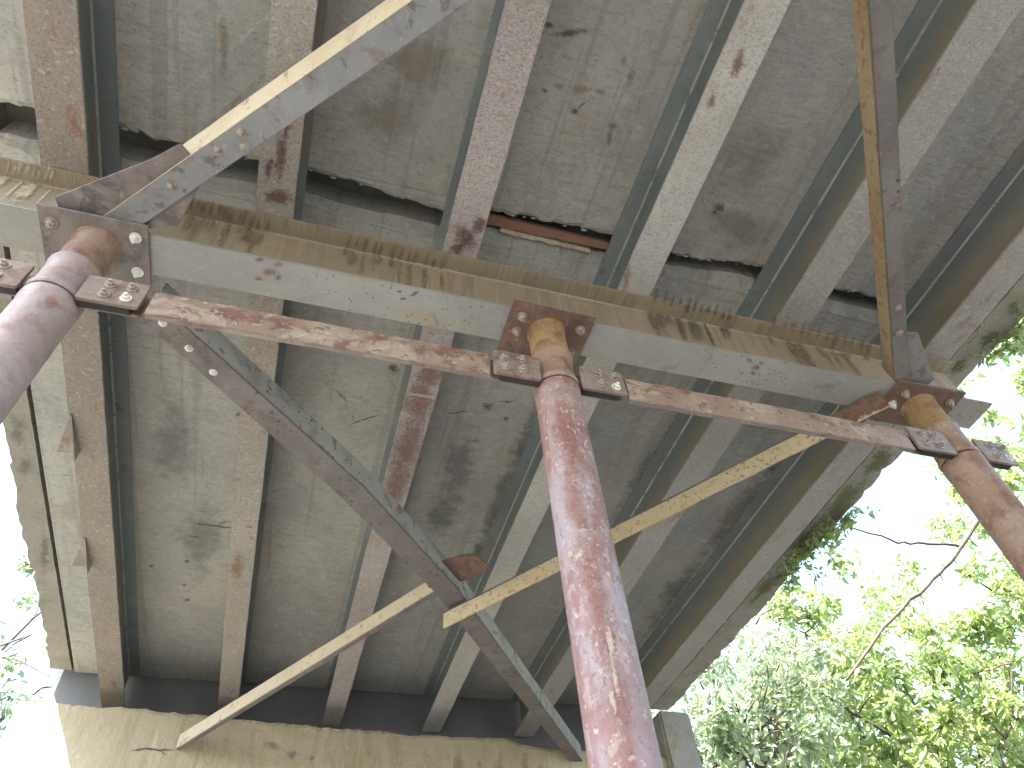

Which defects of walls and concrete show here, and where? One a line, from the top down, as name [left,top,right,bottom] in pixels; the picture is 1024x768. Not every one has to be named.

corrosion [266,126,289,177]
corrosion [265,191,288,203]
corrosion [451,219,485,254]
corrosion [385,368,446,501]
crack [132,747,174,755]